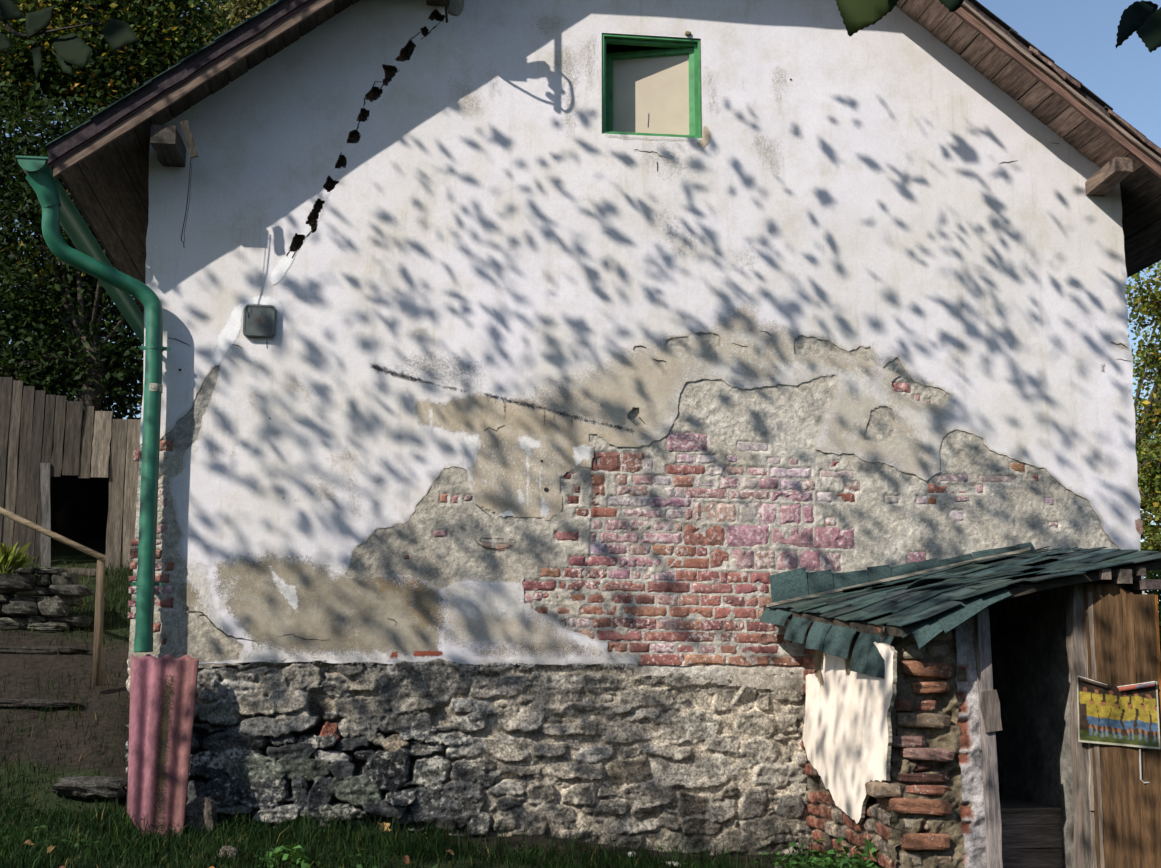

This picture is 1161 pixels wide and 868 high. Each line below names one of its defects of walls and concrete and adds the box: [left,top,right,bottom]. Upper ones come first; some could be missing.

flaking render [127,307,1119,695]